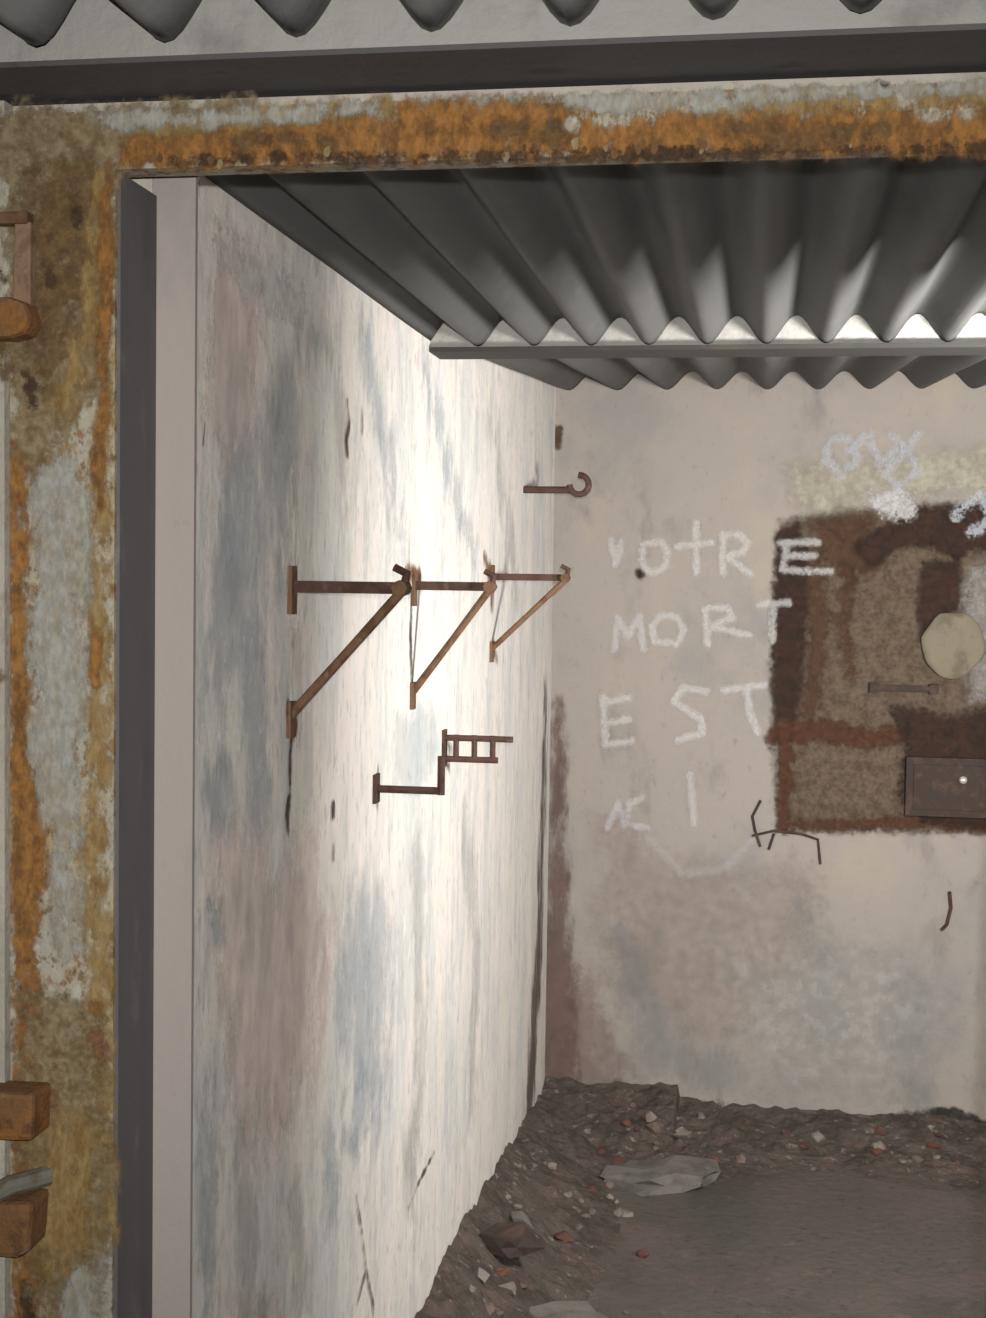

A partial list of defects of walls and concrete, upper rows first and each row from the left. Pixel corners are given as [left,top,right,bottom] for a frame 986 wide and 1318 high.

rust [0,88,986,539]
rust [9,439,119,1318]
rust [285,700,298,835]
rust [405,564,421,682]